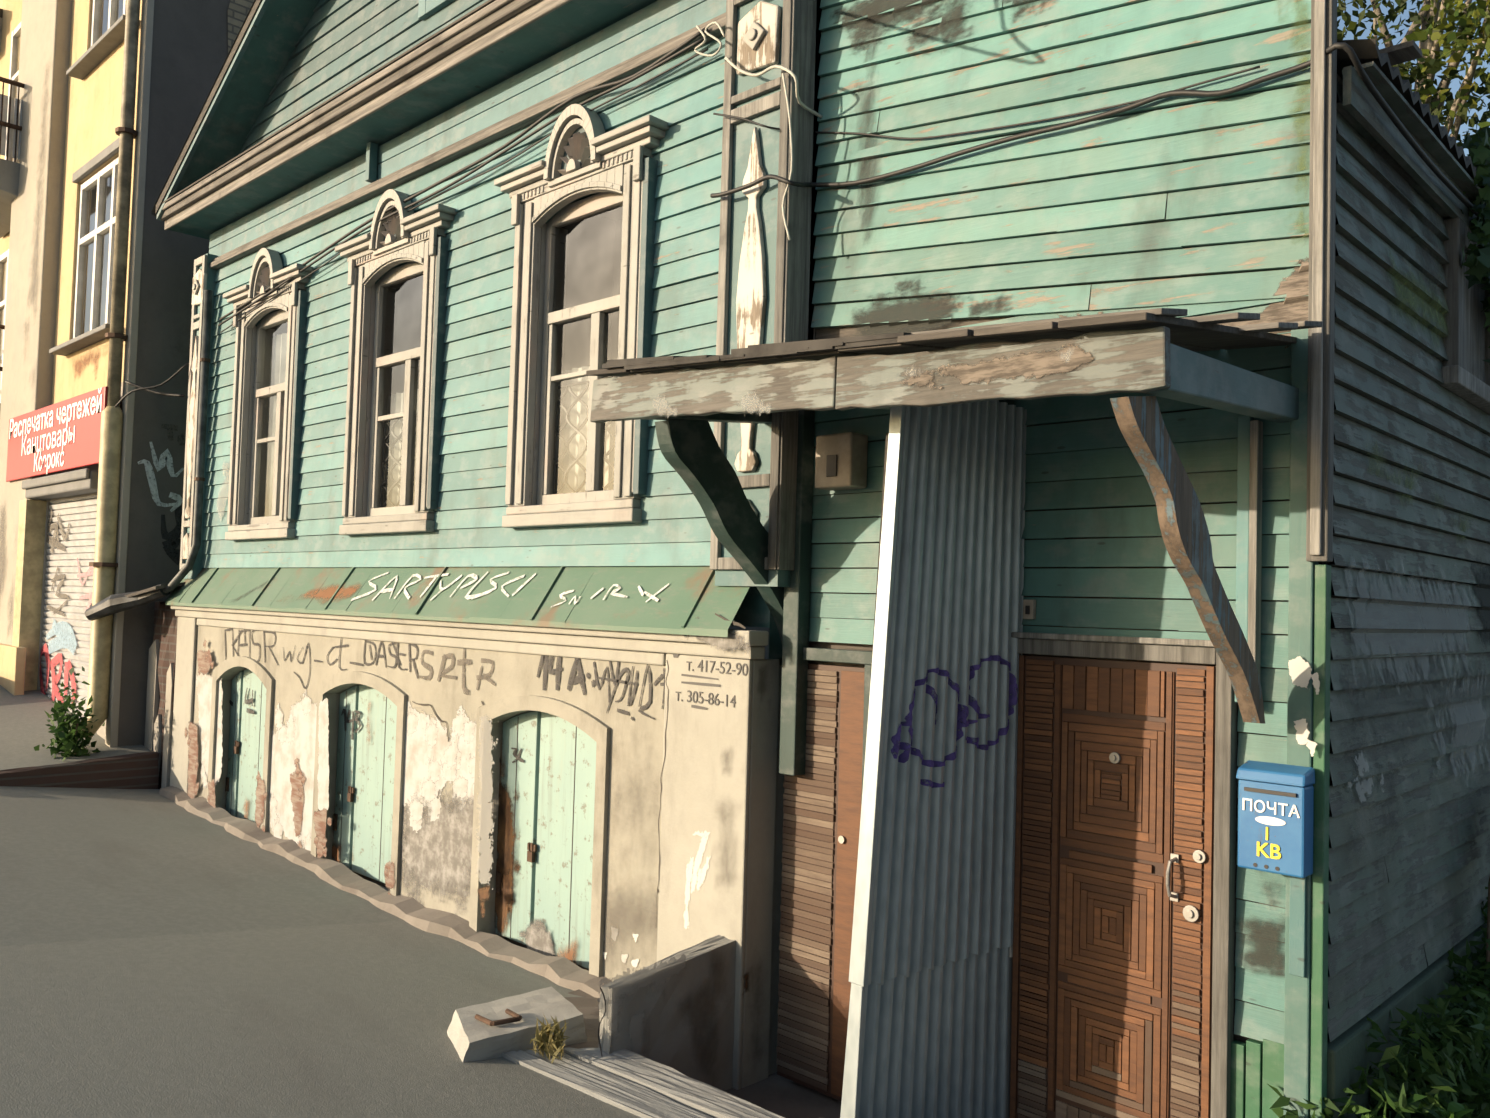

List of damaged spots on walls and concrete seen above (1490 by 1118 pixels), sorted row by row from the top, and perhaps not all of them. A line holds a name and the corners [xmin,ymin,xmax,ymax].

damp [834,0,967,52]
damp [1007,0,1046,17]
damp [854,281,1007,336]
peeling [903,344,1094,390]
peeling [1288,656,1320,694]
peeling [185,640,223,808]
peeling [1294,719,1317,757]
peeling [255,690,331,858]
flaking render [384,701,498,910]
rust [494,757,520,934]